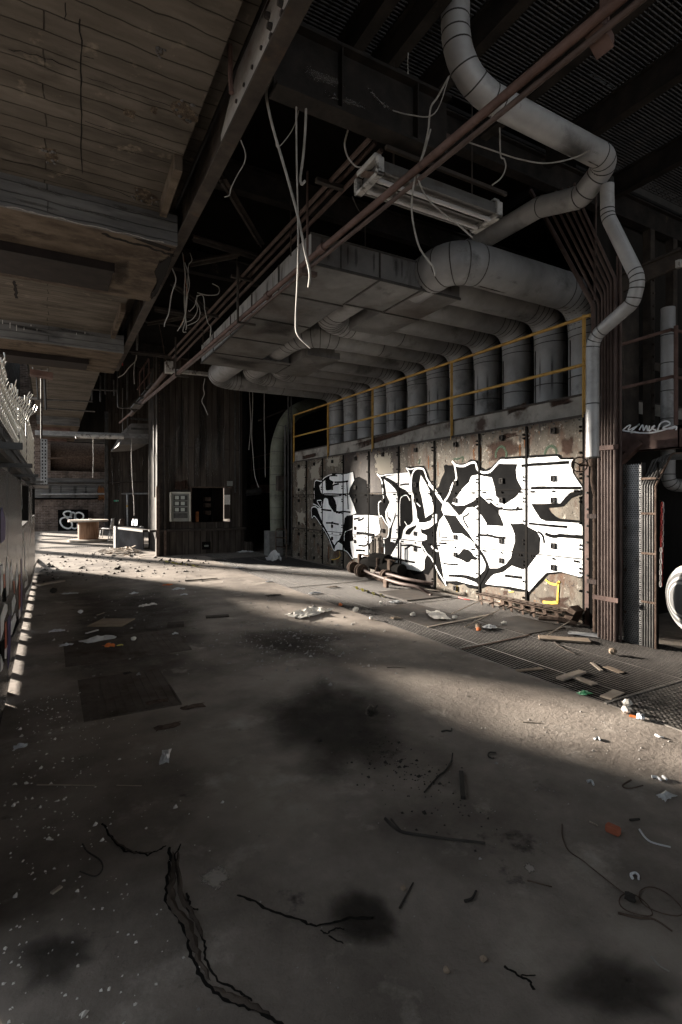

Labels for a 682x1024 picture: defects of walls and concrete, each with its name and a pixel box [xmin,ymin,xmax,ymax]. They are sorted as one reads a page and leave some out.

crack [5,3,183,207]
crack [101,823,284,1024]
crack [237,894,373,944]
crack [504,965,536,990]